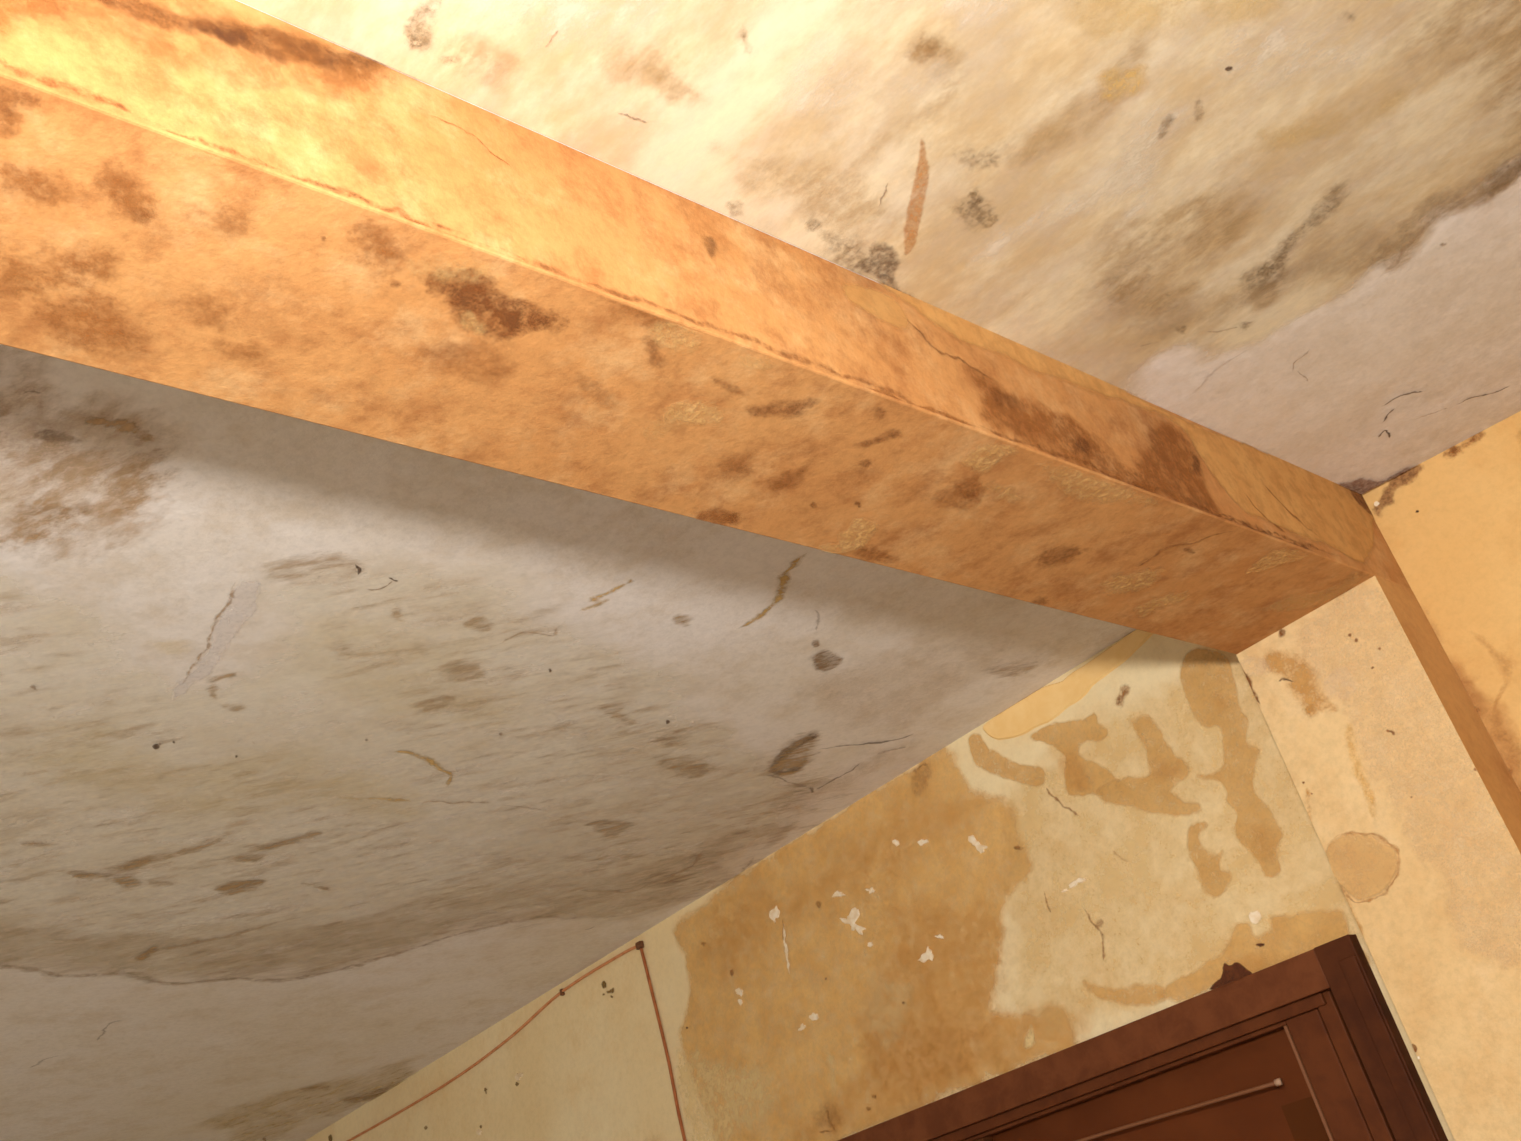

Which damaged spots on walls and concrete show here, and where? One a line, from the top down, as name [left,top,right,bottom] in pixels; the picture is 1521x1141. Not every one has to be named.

damp [102,0,1521,389]
damp [4,253,136,348]
damp [742,558,800,627]
damp [0,579,1076,1141]
flaking render [968,835,988,853]
flaking render [769,906,780,922]
flaking render [832,890,873,947]
flaking render [919,934,944,963]
flaking render [1211,963,1252,990]